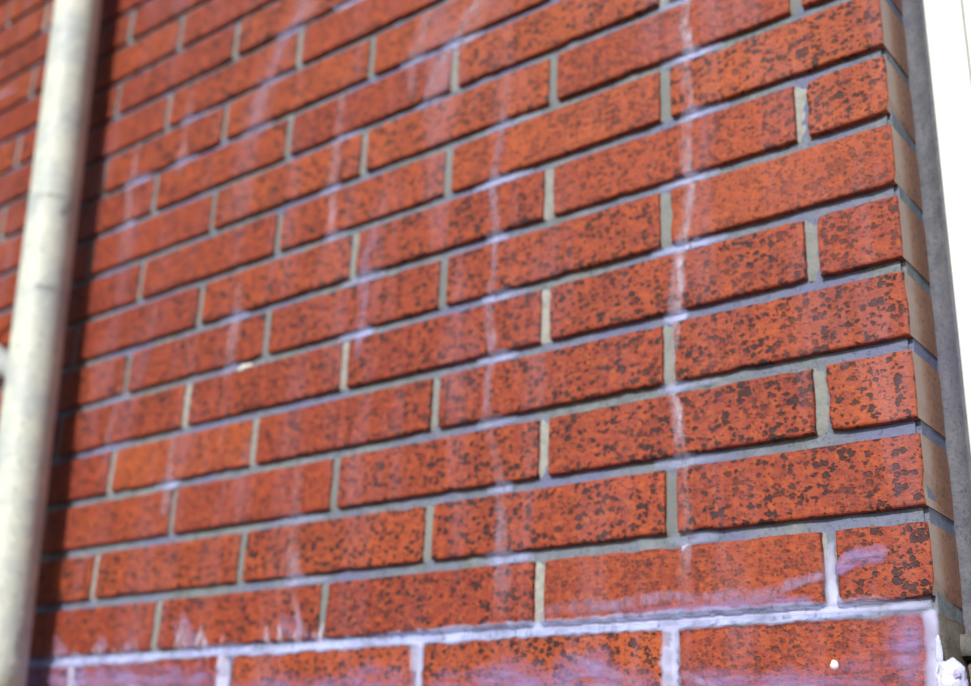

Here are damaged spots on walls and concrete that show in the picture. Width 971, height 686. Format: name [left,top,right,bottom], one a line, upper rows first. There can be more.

water stain [676,34,712,63]
water stain [480,174,523,189]
water stain [675,175,705,186]
water stain [658,239,714,268]
water stain [665,309,688,324]
water stain [481,352,514,363]
water stain [26,550,969,686]